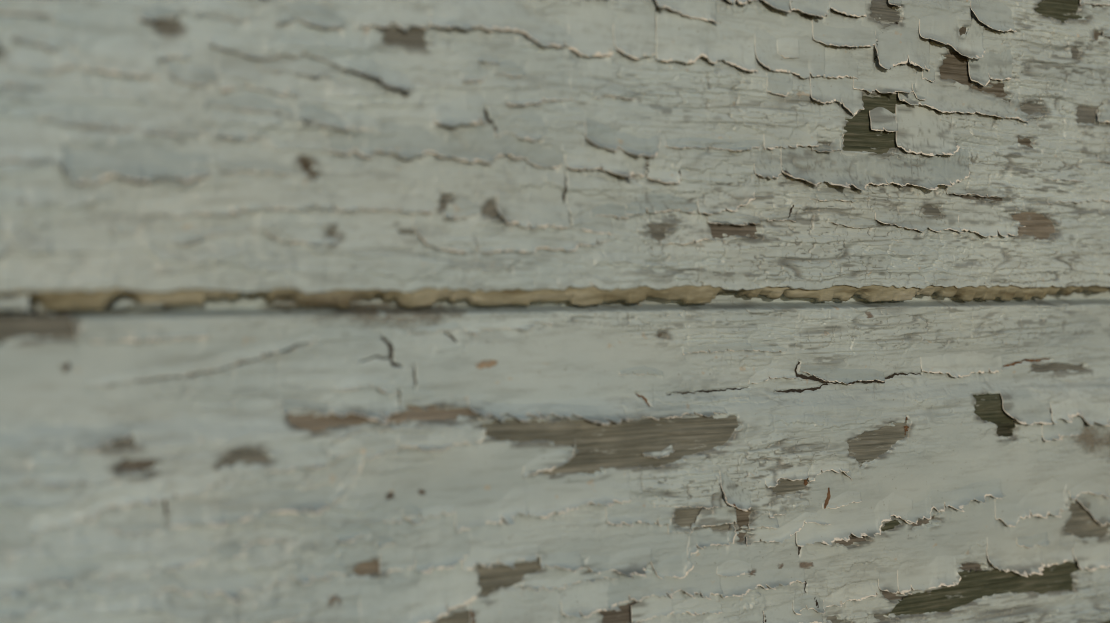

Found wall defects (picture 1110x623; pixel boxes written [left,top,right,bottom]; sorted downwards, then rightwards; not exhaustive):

peeling [59,0,1110,253]
peeling [0,294,210,344]
peeling [920,351,1086,378]
peeling [281,395,739,479]
peeling [973,389,1110,442]
peeling [29,450,270,534]
peeling [313,417,1110,623]